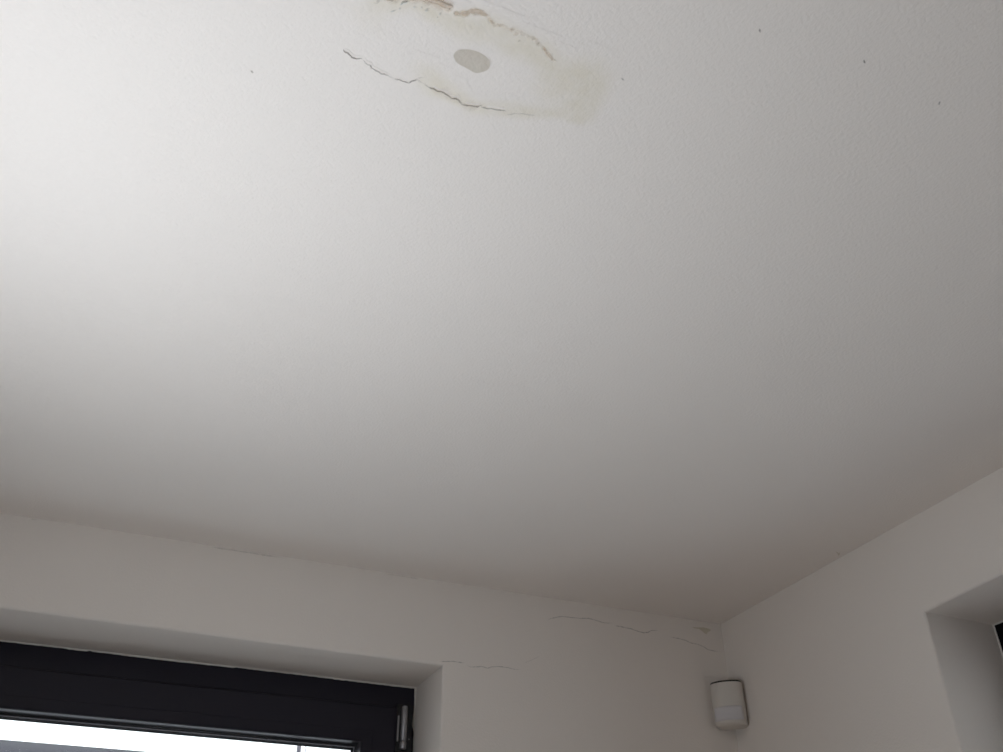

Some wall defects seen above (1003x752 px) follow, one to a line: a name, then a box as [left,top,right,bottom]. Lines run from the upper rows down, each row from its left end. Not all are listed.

water stain [328,0,627,133]